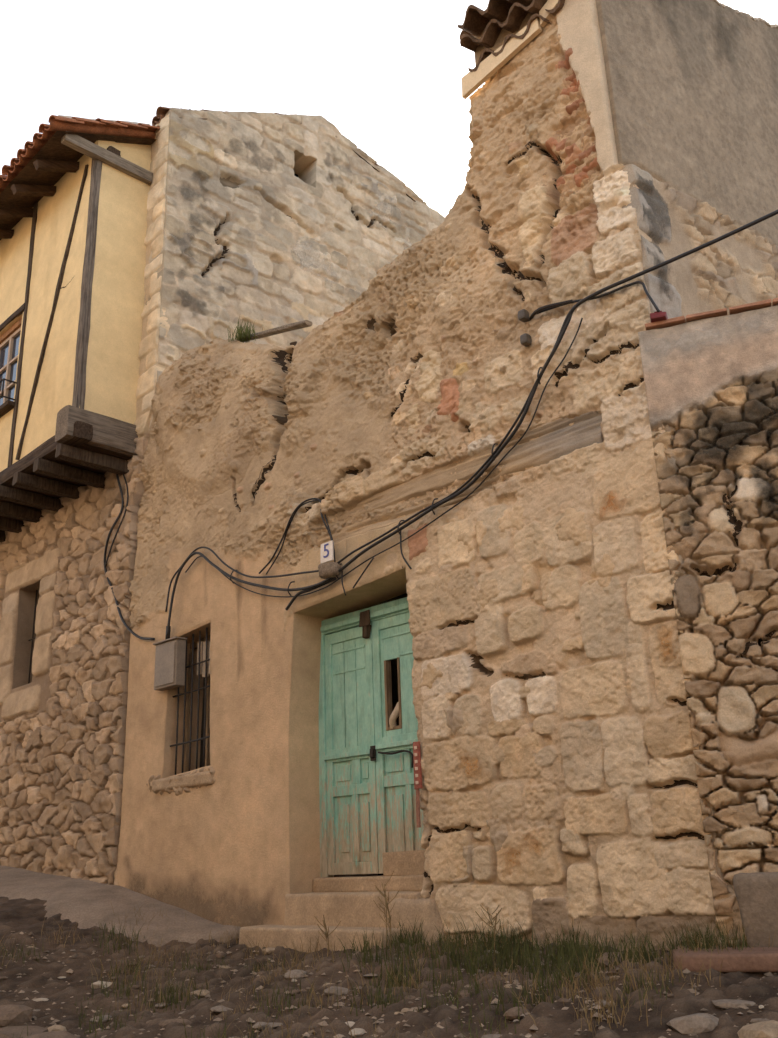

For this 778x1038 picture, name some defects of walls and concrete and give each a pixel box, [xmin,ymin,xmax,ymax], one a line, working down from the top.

spalling [219,174,241,188]
flaking render [514,156,529,176]
crack [508,141,562,229]
flaking render [517,33,602,262]
crack [472,194,546,301]
spalling [366,318,398,337]
crack [271,341,297,405]
flaking render [406,350,471,433]
crack [233,455,277,512]